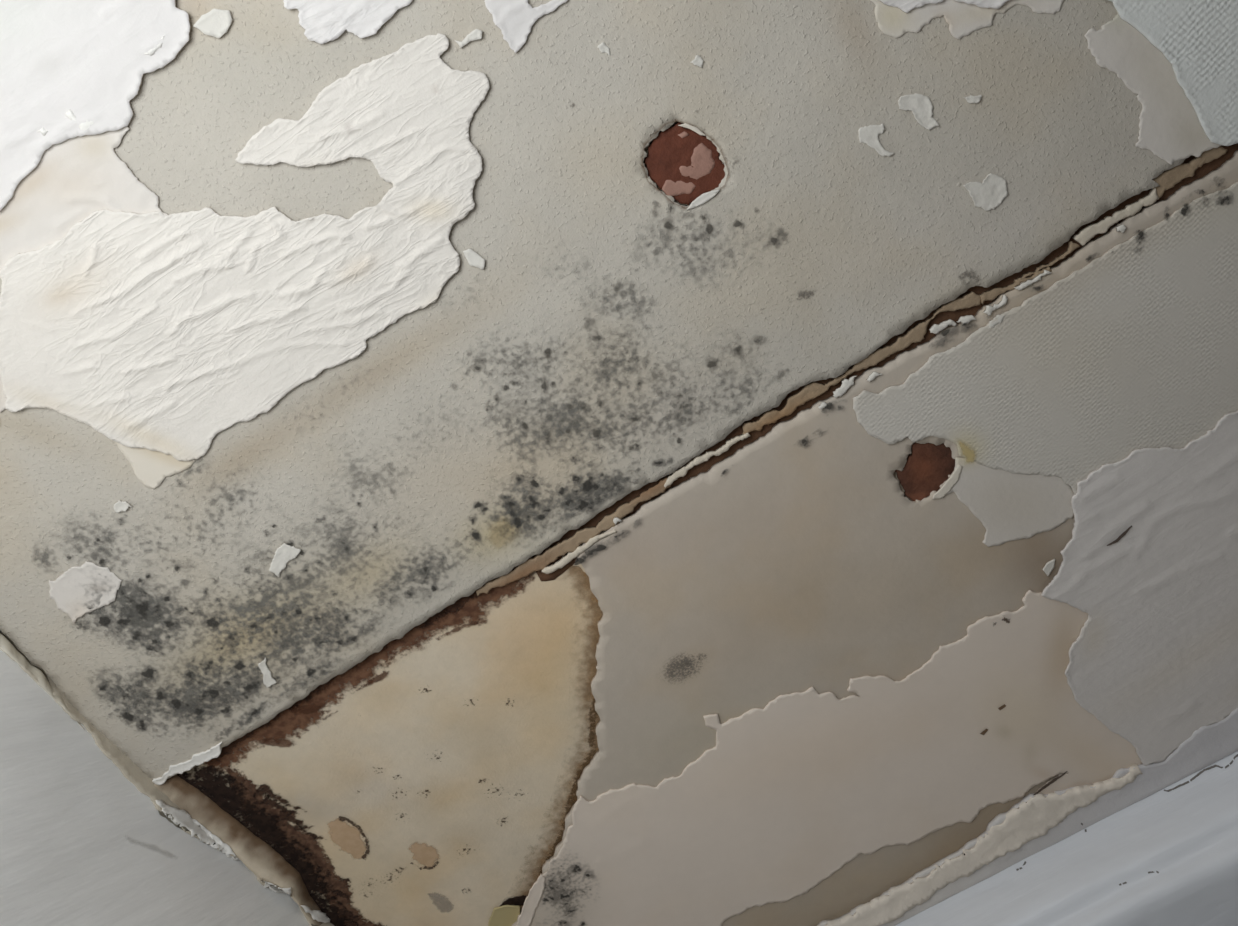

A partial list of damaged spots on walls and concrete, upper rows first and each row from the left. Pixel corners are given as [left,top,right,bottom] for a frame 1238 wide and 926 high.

peeling [484,0,568,53]
peeling [870,0,1064,39]
peeling [1084,14,1222,165]
peeling [0,0,490,489]
damp [508,348,702,452]
crack [476,143,1238,596]
damp [470,473,629,539]
damp [77,527,552,926]
damp [500,532,625,926]
peeling [488,410,1238,926]
crack [1034,771,1067,795]
crack [1164,754,1238,792]